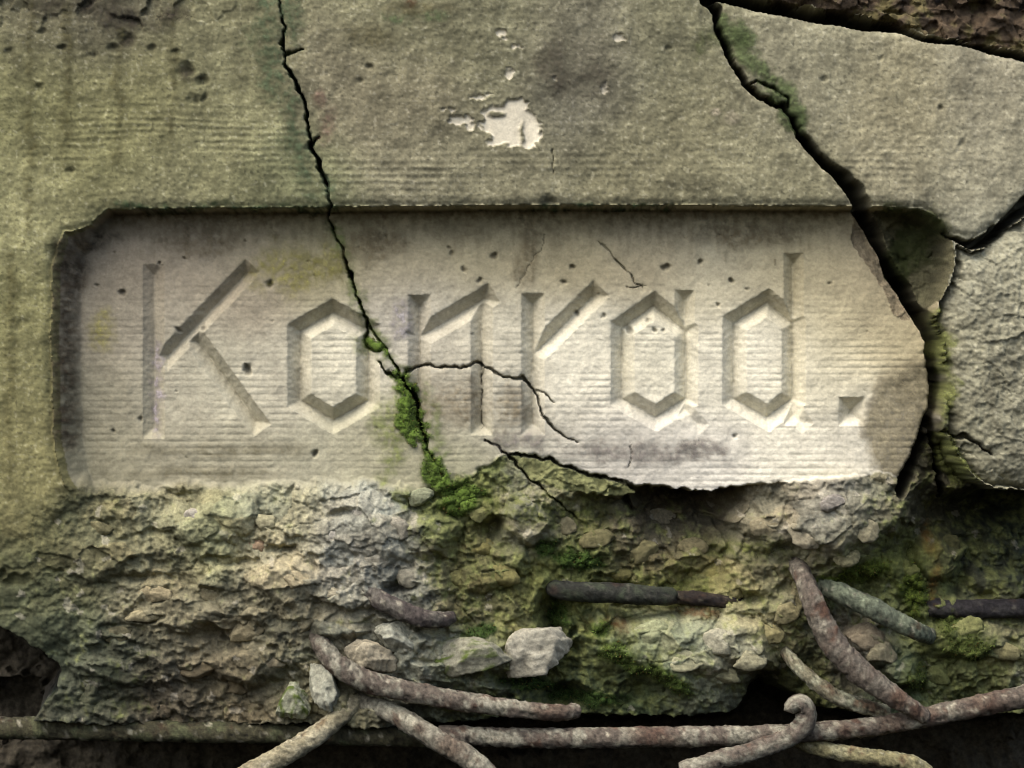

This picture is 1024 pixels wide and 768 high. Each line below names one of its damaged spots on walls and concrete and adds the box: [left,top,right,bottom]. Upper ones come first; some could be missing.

crack [278,0,634,521]
peeling [441,93,544,150]
peeling [496,30,525,50]
crack [598,241,647,290]
crack [699,0,1024,501]
spalling [0,432,1024,768]